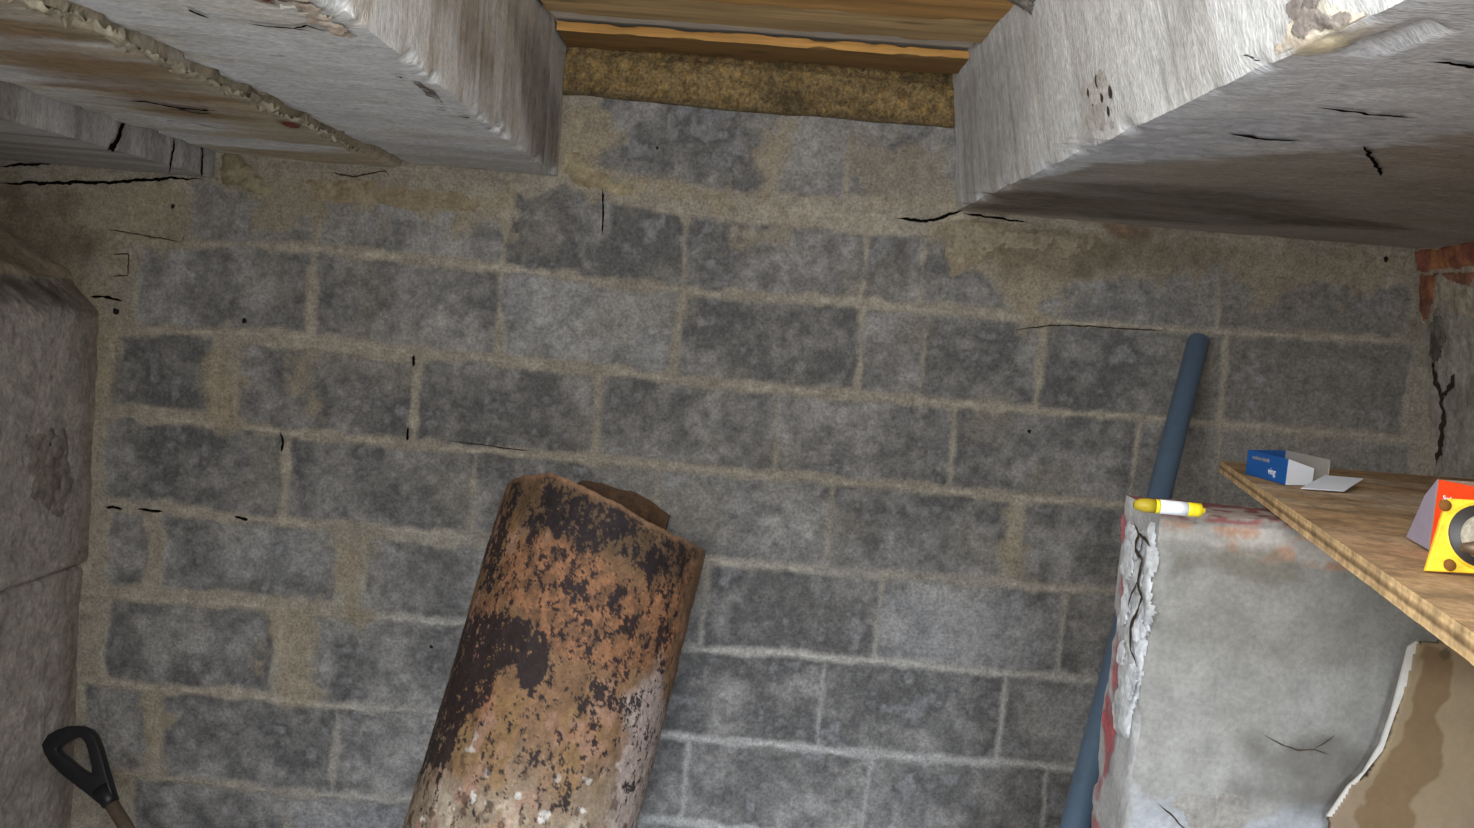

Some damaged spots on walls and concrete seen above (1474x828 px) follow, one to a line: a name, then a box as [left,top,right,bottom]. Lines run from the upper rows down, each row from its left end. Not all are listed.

spalling [1242,0,1370,61]
crack [0,101,214,186]
crack [897,210,1024,223]
spalling [1415,242,1474,335]
crack [1431,361,1455,463]
crack [1120,522,1150,667]
peeling [1170,793,1252,828]